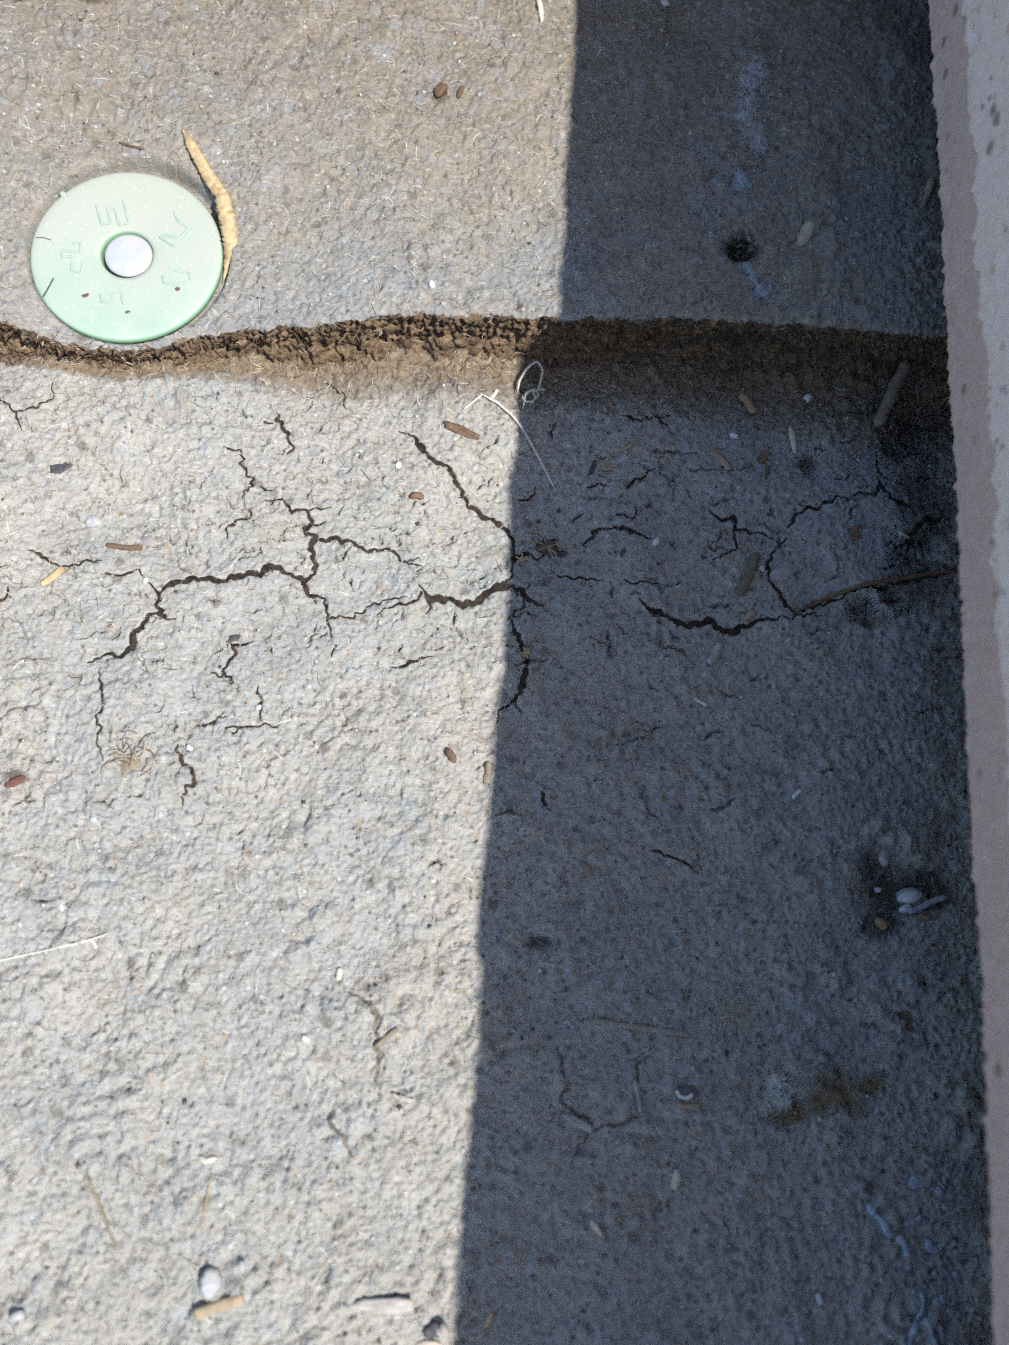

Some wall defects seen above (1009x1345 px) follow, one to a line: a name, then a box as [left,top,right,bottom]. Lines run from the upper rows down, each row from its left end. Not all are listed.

crack [0,382,54,431]
crack [326,382,346,409]
crack [0,412,947,762]
crack [175,641,278,805]
crack [541,791,551,811]
crack [708,798,735,813]